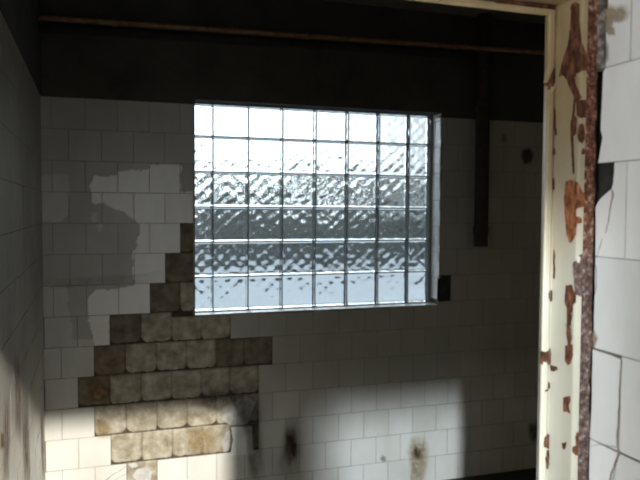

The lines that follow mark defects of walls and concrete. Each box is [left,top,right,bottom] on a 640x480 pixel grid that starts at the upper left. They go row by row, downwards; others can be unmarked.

peeling [543,59,557,92]
spalling [596,0,608,72]
crack [594,190,614,293]
spalling [78,223,272,480]
rust [565,254,585,365]
crack [591,344,622,480]